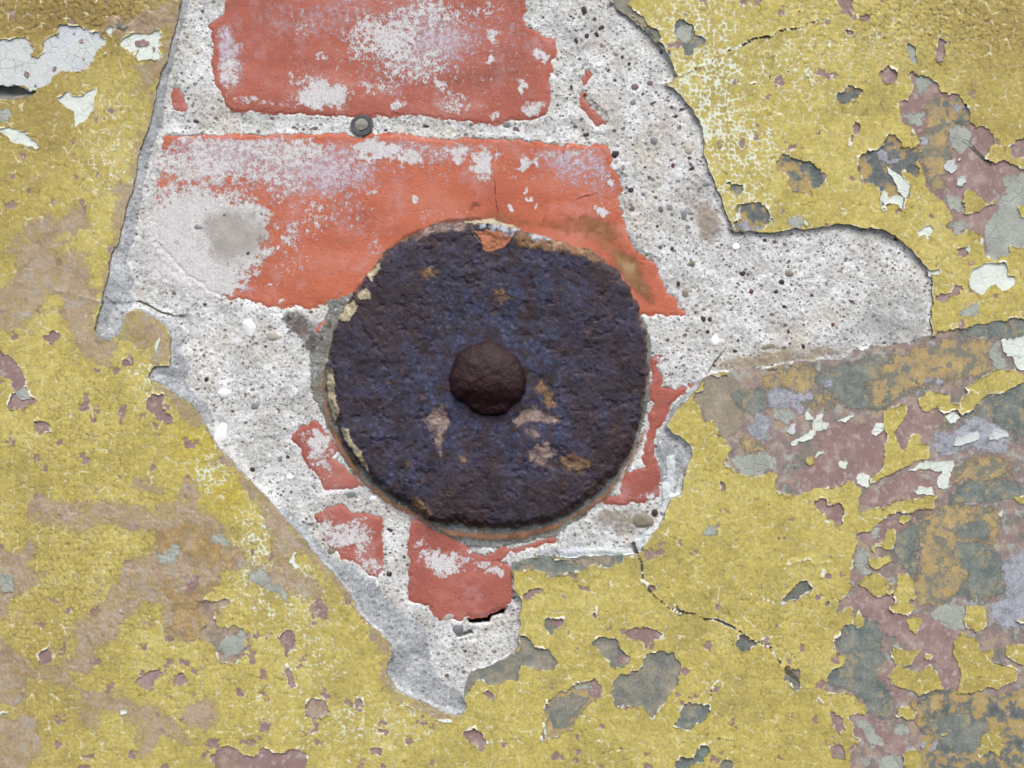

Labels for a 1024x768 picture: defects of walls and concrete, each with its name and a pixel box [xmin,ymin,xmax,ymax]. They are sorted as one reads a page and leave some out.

crack [673,11,824,78]
rust [583,215,617,240]
rust [614,252,651,301]
spalling [0,0,637,755]
spalling [370,0,1024,768]
rust [323,385,645,539]
crack [631,541,800,683]